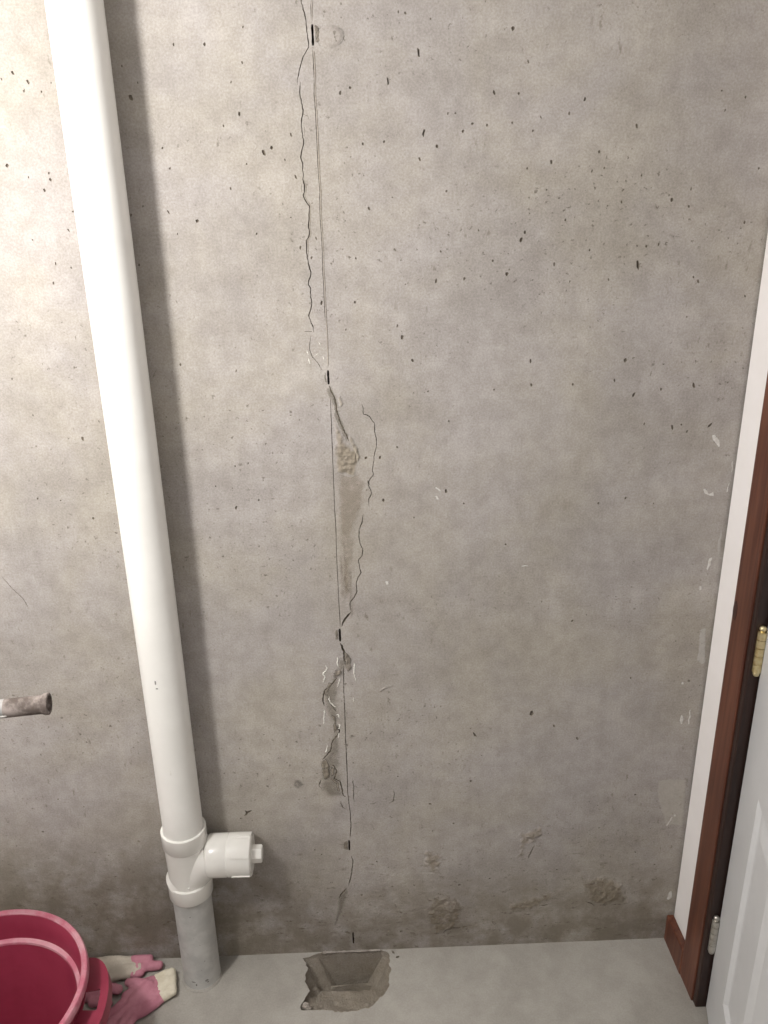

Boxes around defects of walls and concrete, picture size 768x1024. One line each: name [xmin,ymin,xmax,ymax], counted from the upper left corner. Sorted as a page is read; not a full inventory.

crack [297,0,320,366]
crack [342,406,377,626]
peeling [319,631,351,808]